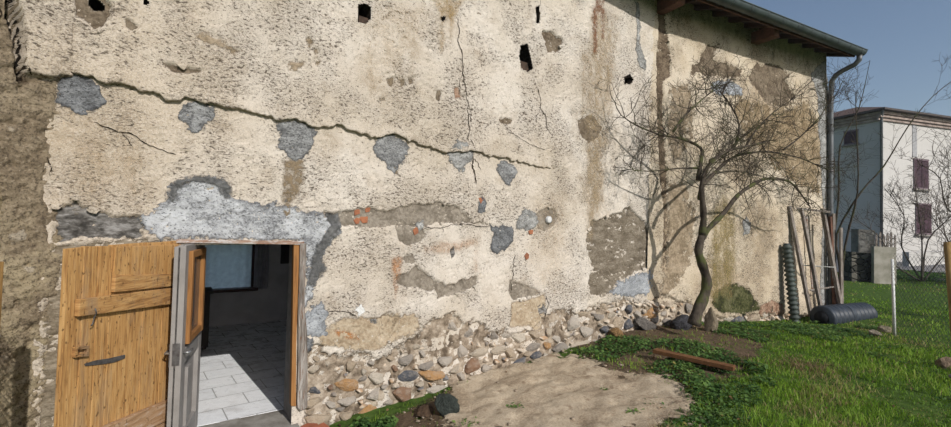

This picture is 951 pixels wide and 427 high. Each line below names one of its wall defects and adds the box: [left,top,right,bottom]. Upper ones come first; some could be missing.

crack [95,122,176,155]
crack [458,25,481,184]
peeling [656,14,821,296]
spalling [586,207,648,297]
peeling [319,313,420,351]
peeling [508,280,547,332]